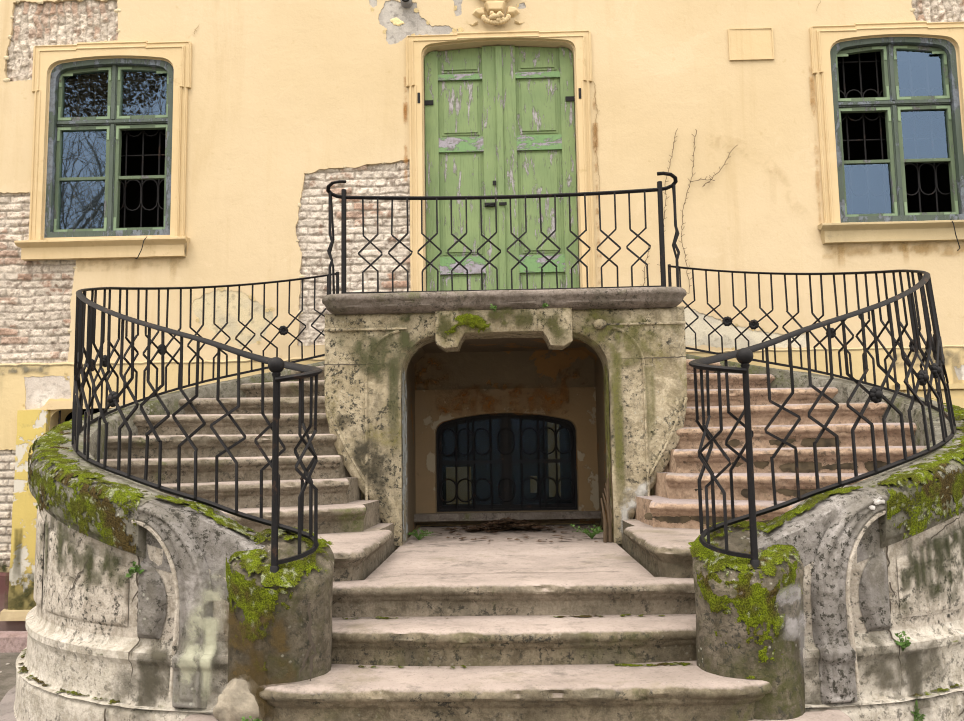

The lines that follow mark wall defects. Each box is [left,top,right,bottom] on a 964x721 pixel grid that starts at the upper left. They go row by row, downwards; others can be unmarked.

flaking render [3,0,121,82]
flaking render [369,0,464,45]
flaking render [910,0,964,23]
flaking render [0,191,78,410]
flaking render [296,160,411,346]
flaking render [0,449,16,567]